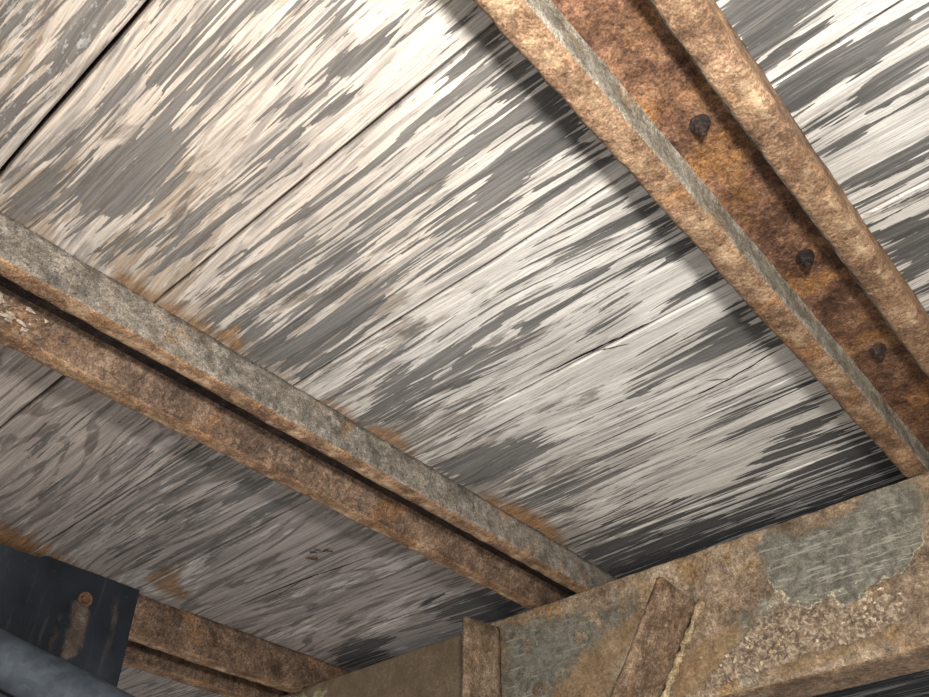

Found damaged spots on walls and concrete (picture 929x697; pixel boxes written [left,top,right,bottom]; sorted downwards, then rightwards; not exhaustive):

peeling [0,292,49,332]
peeling [410,299,925,612]
corrosion [487,498,560,541]
corrosion [703,580,909,689]